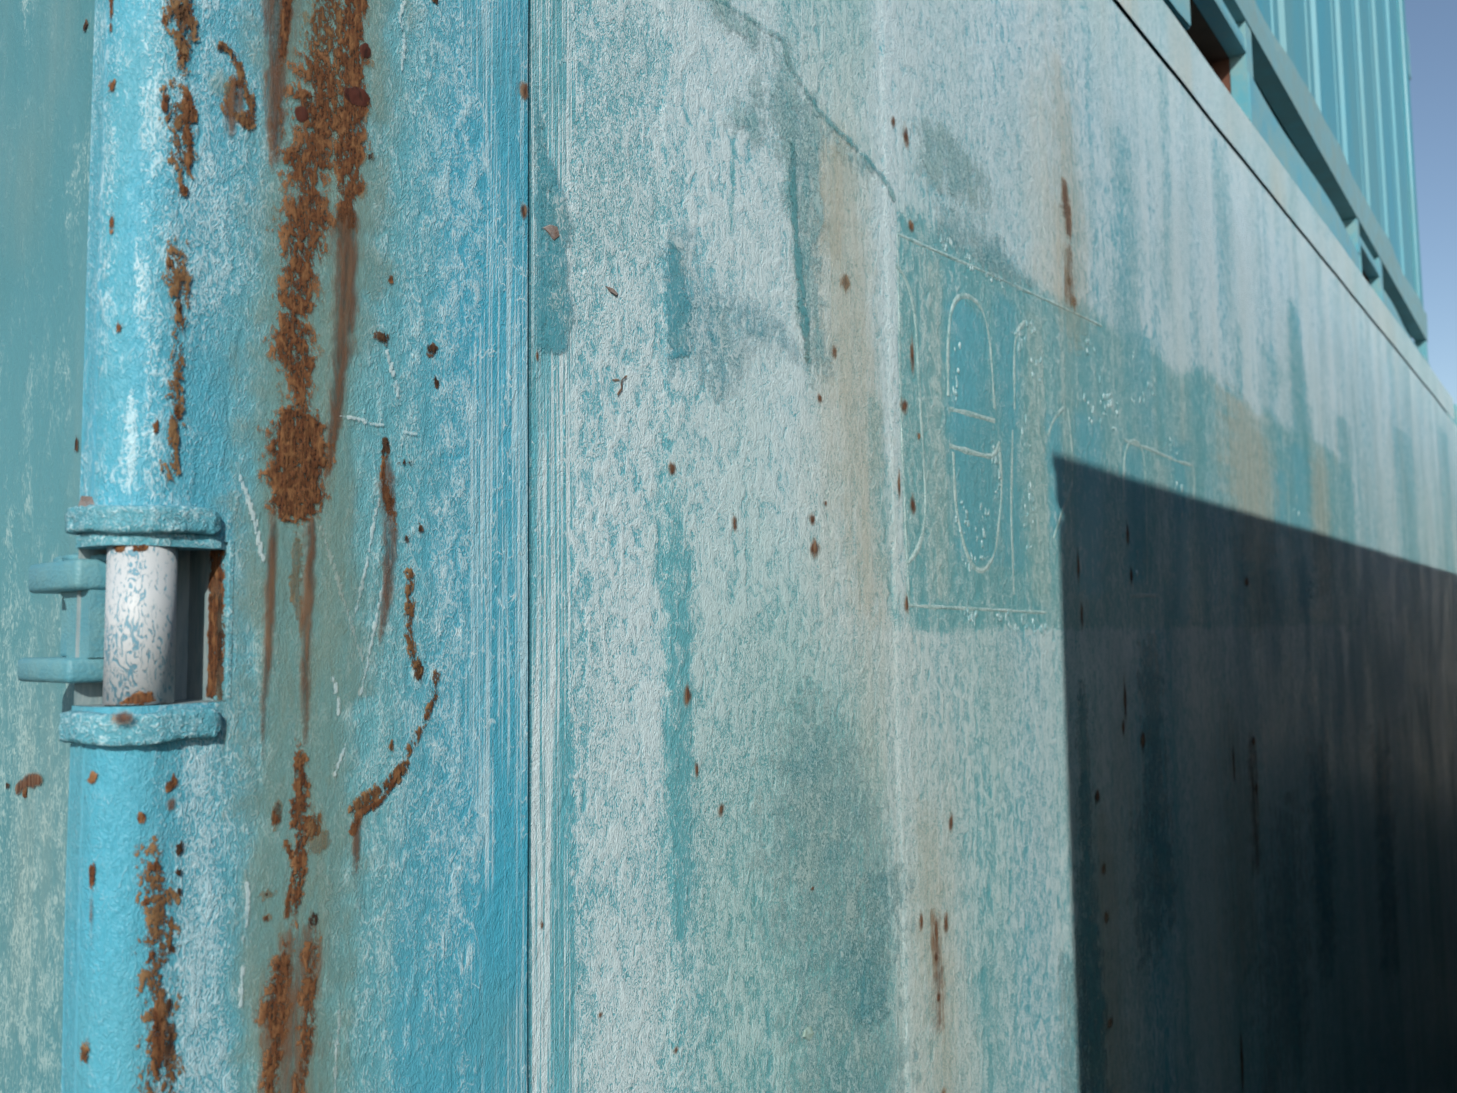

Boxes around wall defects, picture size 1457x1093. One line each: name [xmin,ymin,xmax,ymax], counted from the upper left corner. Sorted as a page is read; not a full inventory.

rust [159,0,200,196]
rust [153,235,193,484]
rust [217,0,375,720]
rust [373,330,390,346]
rust [206,550,226,700]
rust [348,436,441,867]
rust [135,811,185,1093]
rust [165,773,177,809]
rust [255,738,332,1093]